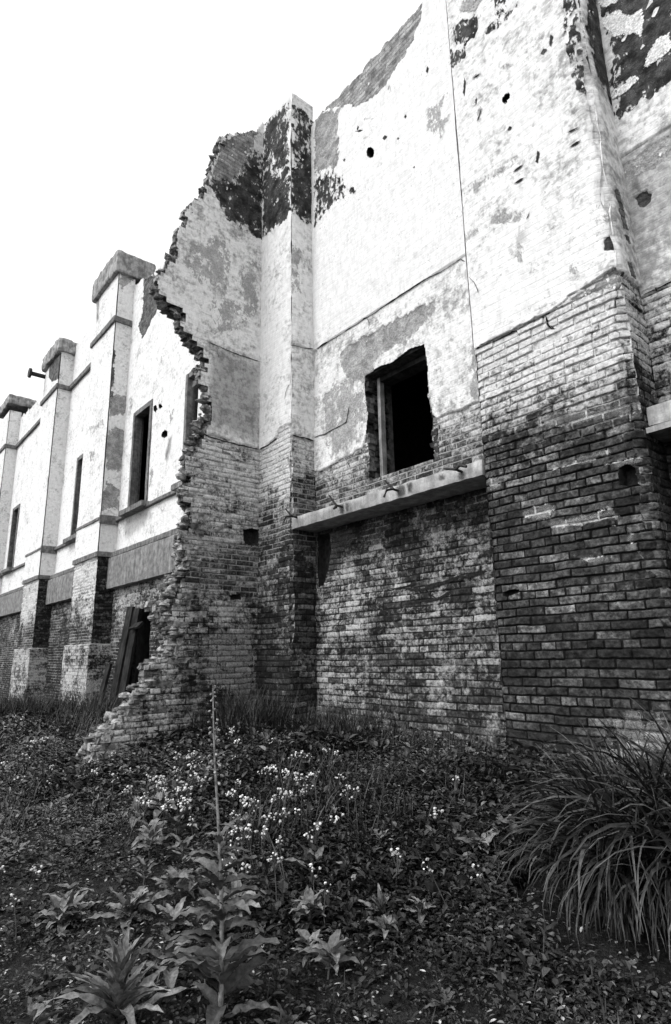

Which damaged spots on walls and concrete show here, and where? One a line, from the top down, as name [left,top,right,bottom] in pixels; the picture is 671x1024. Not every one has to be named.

peeling [448,0,518,68]
peeling [535,0,671,120]
spalling [635,191,651,207]
spalling [76,4,436,762]